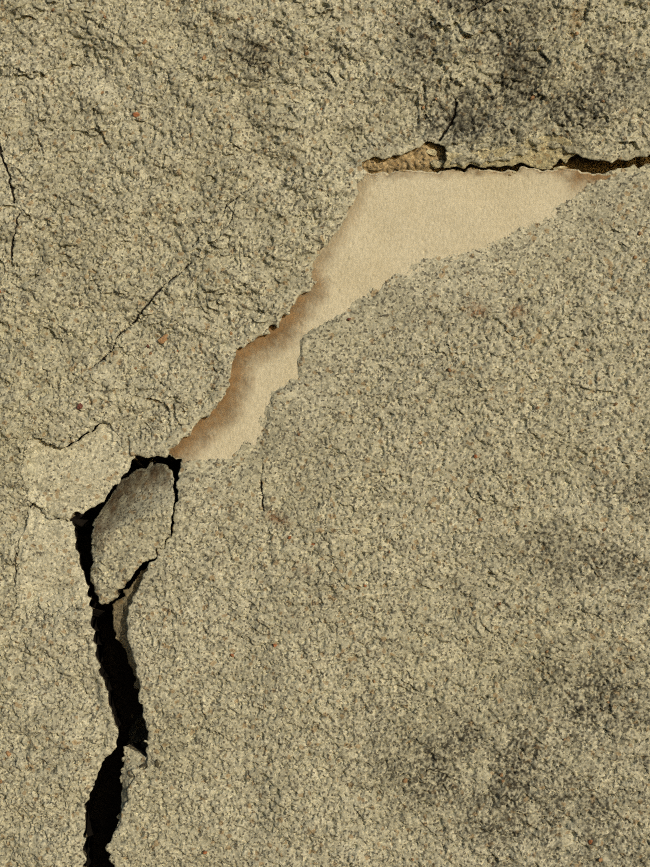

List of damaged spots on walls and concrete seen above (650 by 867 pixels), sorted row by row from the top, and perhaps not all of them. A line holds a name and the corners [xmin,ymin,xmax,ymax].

crack [362,100,650,176]
crack [0,146,20,266]
crack [85,263,192,387]
spalling [169,166,611,463]
crack [80,455,182,867]